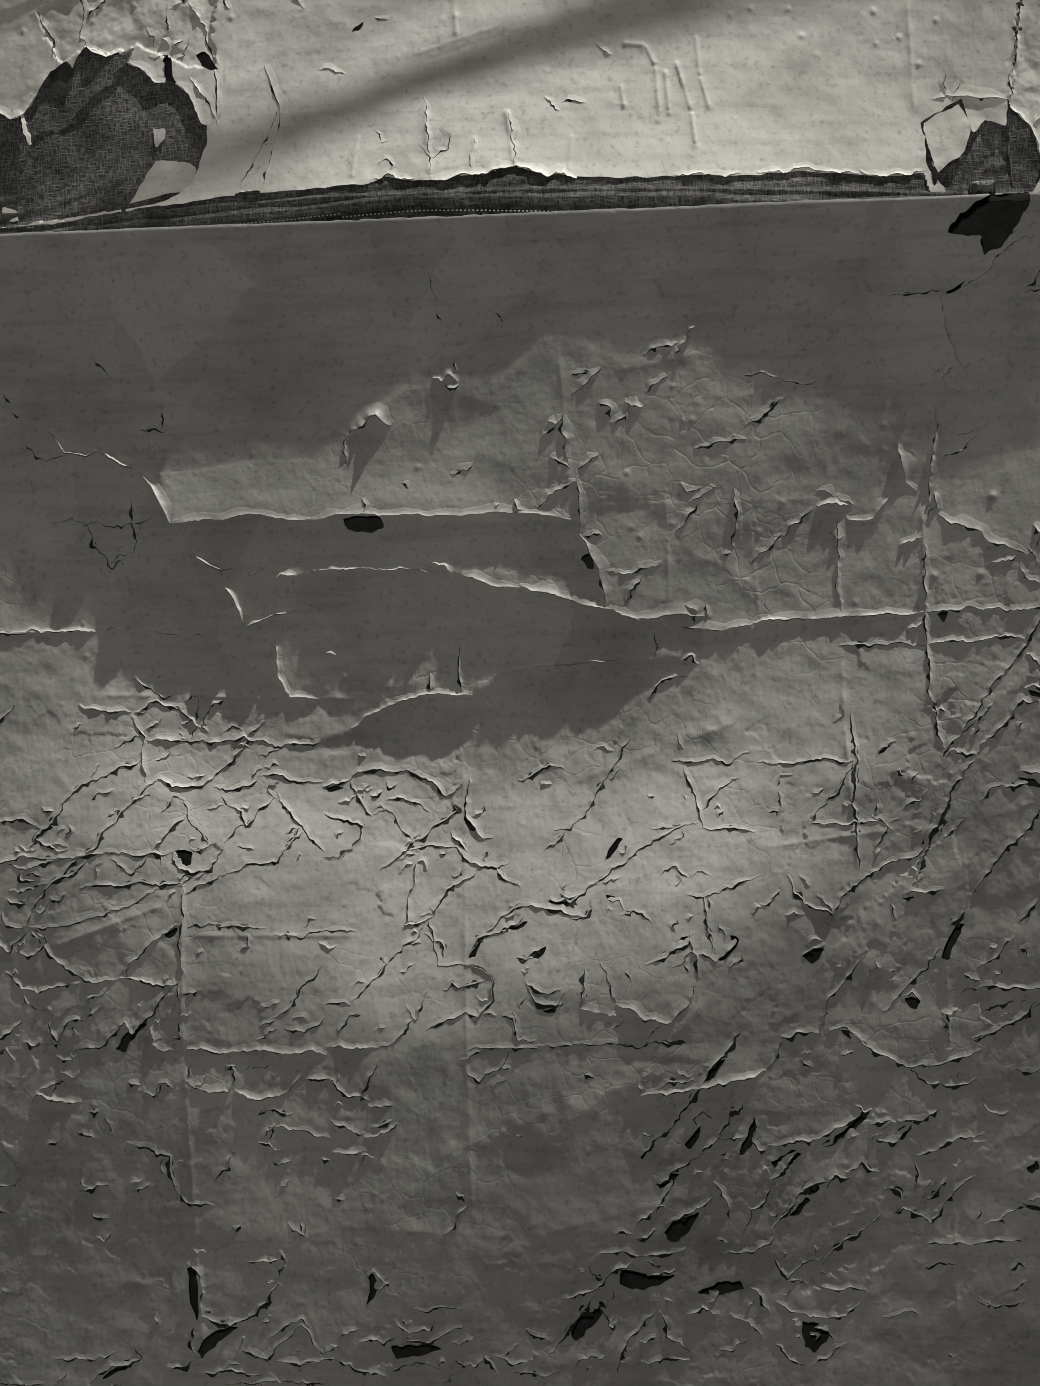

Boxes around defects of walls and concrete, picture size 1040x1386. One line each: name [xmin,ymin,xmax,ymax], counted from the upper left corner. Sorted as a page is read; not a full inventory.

peeling [147,0,220,124]
peeling [129,128,196,204]
crack [420,97,451,173]
peeling [923,98,1008,178]
crack [535,366,667,508]
crack [694,366,816,449]
spalling [343,516,384,533]
crack [675,481,743,556]
crack [0,511,1040,1099]
spalling [176,836,205,886]
peeling [0,897,744,1187]
crack [0,894,1040,1386]